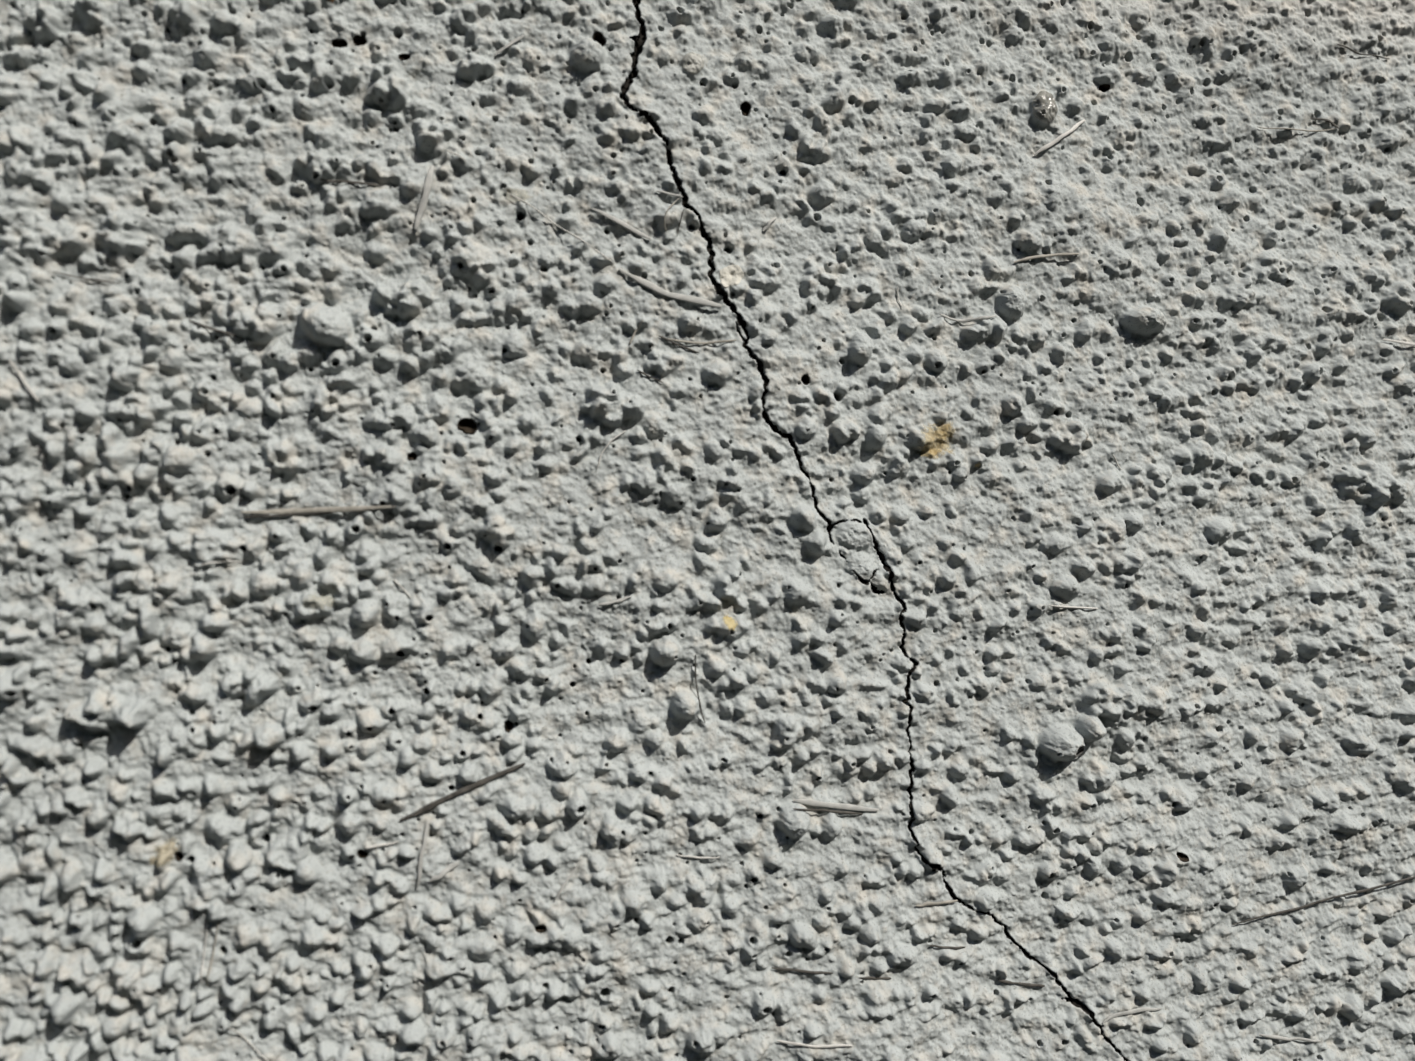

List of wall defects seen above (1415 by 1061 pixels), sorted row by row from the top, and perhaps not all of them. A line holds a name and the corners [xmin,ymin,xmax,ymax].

crack [620,0,1128,1061]